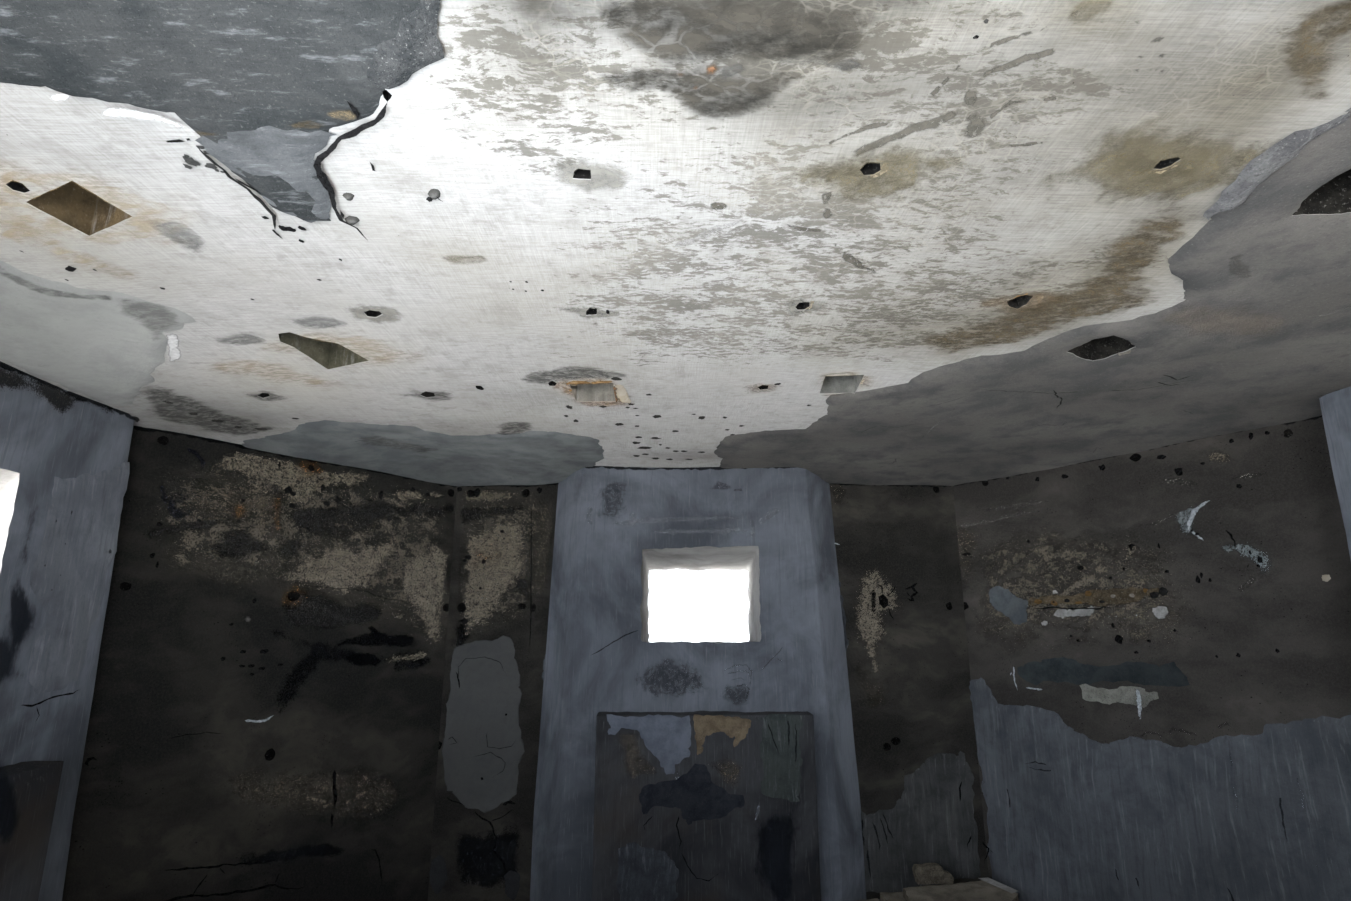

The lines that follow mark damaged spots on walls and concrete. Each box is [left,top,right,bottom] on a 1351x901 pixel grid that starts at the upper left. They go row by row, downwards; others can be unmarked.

water stain [603,0,869,117]
water stain [1289,3,1351,96]
spalling [6,180,30,193]
peeling [103,108,182,127]
flaking render [182,145,225,173]
crack [313,101,387,238]
spalling [789,91,1020,232]
hole [1007,293,1033,309]
water stain [928,217,1183,353]
peeling [150,452,549,664]
peeling [962,523,1212,654]
peeling [607,714,751,825]